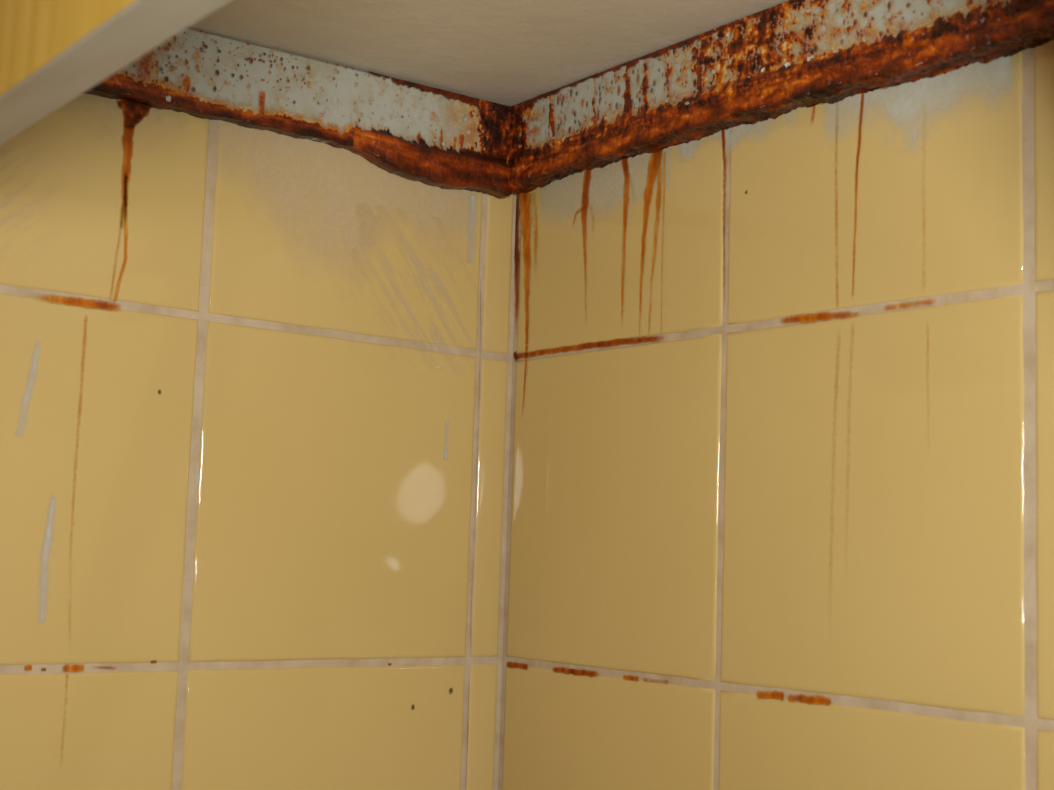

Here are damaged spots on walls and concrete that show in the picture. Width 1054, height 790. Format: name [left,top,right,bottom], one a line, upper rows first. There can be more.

rust [41,30,360,355]
rust [368,0,1054,405]
rust [507,662,528,670]
rust [554,667,597,677]
rust [757,691,831,705]